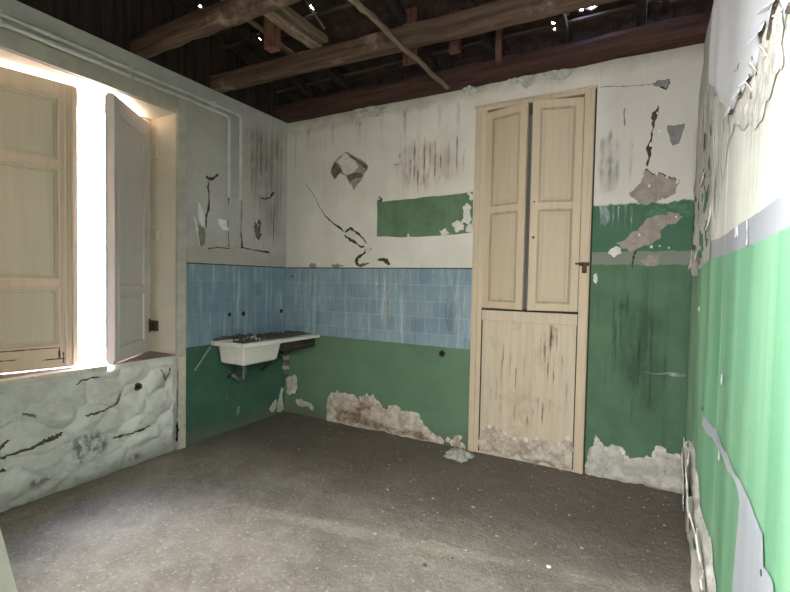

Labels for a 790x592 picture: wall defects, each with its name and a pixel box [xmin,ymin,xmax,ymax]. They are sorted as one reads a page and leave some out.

peeling [708,0,790,137]
crack [600,79,670,166]
crack [307,186,390,267]
peeling [608,168,694,267]
crack [0,432,63,473]
crack [85,393,121,417]
crack [113,425,151,439]
crack [160,367,179,442]
peeling [326,390,466,449]
peeling [477,424,575,470]
peeling [585,436,716,592]
peeling [701,407,773,592]